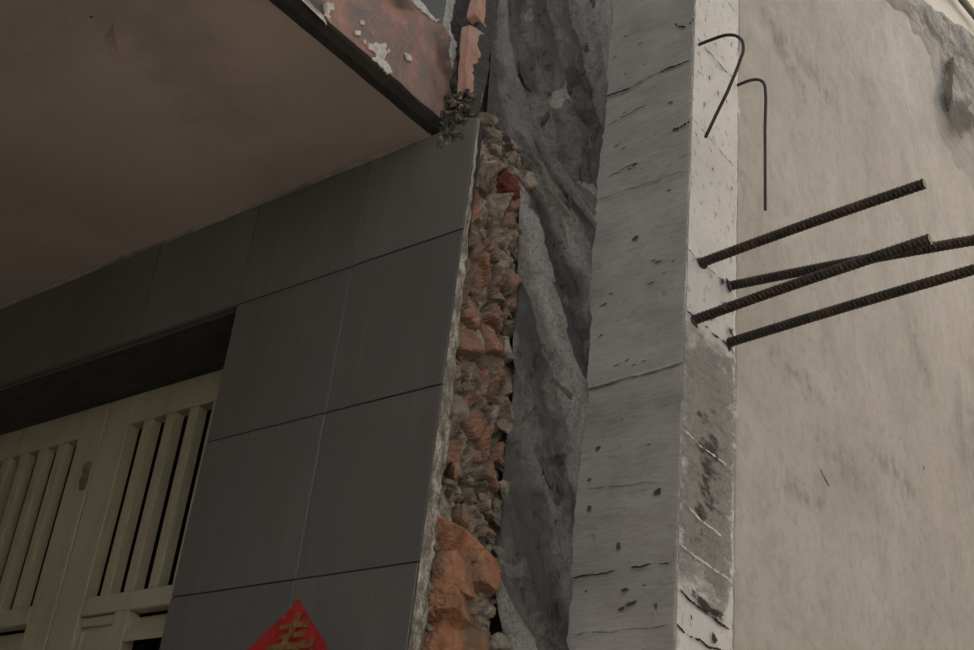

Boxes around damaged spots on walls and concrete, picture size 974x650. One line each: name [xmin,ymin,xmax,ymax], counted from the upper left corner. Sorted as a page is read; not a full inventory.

peeling [302,0,334,26]
peeling [353,20,392,75]
spalling [886,0,974,190]
spalling [697,179,927,269]
spalling [412,0,538,650]
spalling [690,234,974,352]